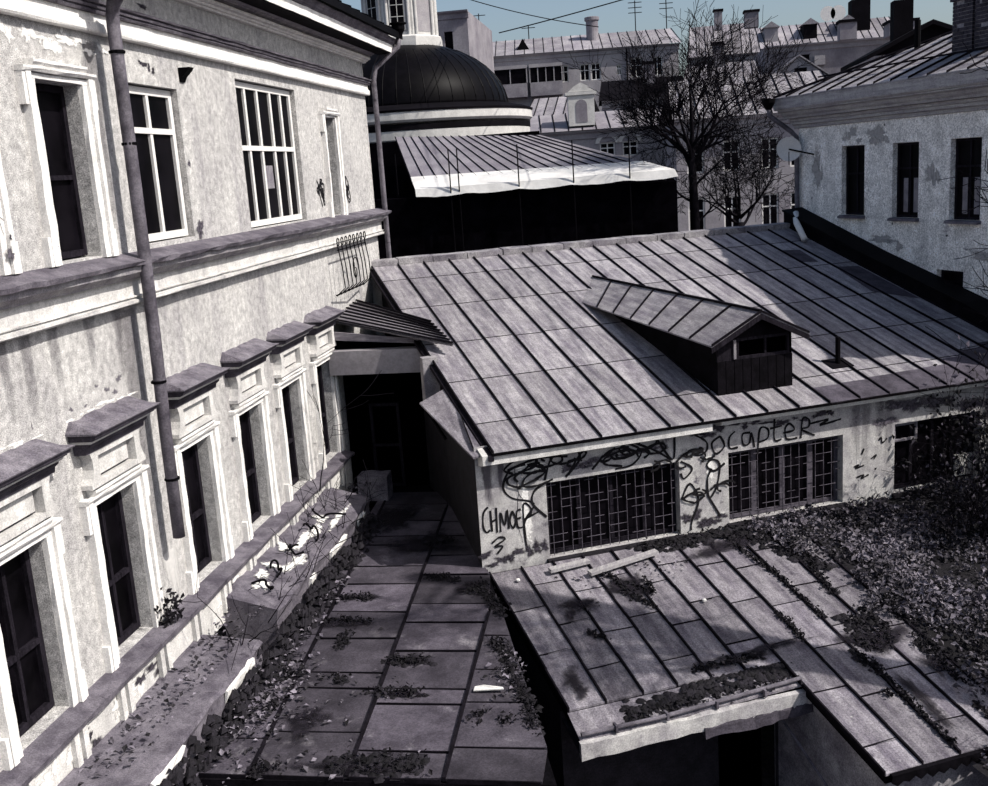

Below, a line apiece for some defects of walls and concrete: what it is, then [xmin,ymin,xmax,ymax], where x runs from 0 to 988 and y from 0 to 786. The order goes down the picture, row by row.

flaking render [0,20,108,57]